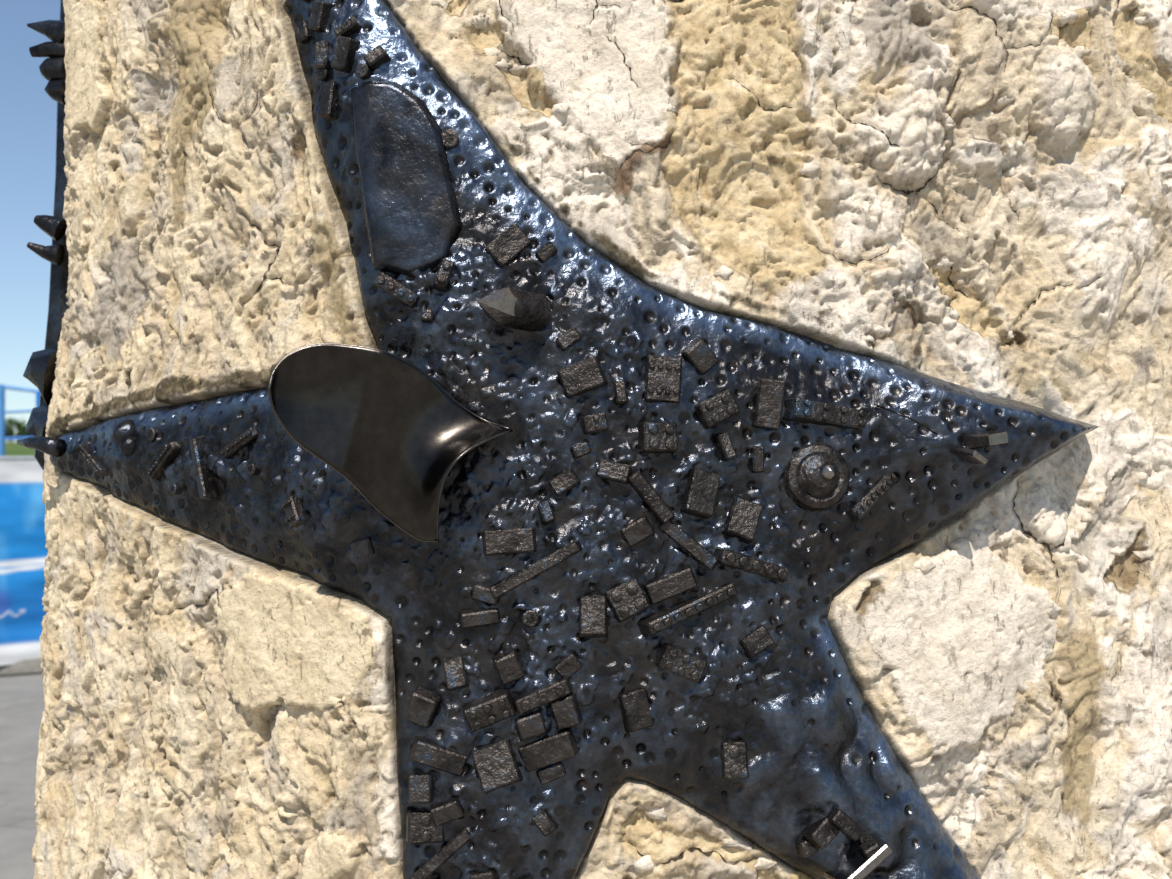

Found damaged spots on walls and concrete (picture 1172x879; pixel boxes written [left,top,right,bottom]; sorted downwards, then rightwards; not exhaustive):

crack [589,0,638,86]
crack [939,0,1052,71]
crack [836,103,900,147]
crack [877,164,960,232]
crack [807,242,889,265]
crack [948,267,968,298]
crack [1017,277,1101,322]
crack [1013,476,1068,618]